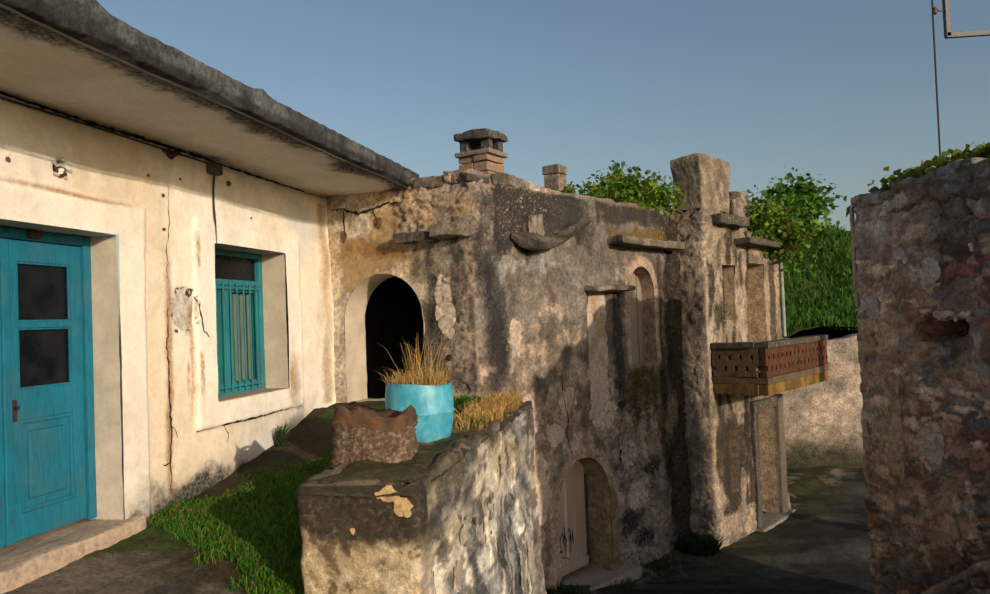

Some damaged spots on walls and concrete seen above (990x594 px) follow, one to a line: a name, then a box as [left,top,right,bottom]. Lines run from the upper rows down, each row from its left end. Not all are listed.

crack [0,91,402,236]
peeling [170,286,201,336]
crack [166,192,210,338]
crack [163,311,303,499]
peeling [374,485,413,518]